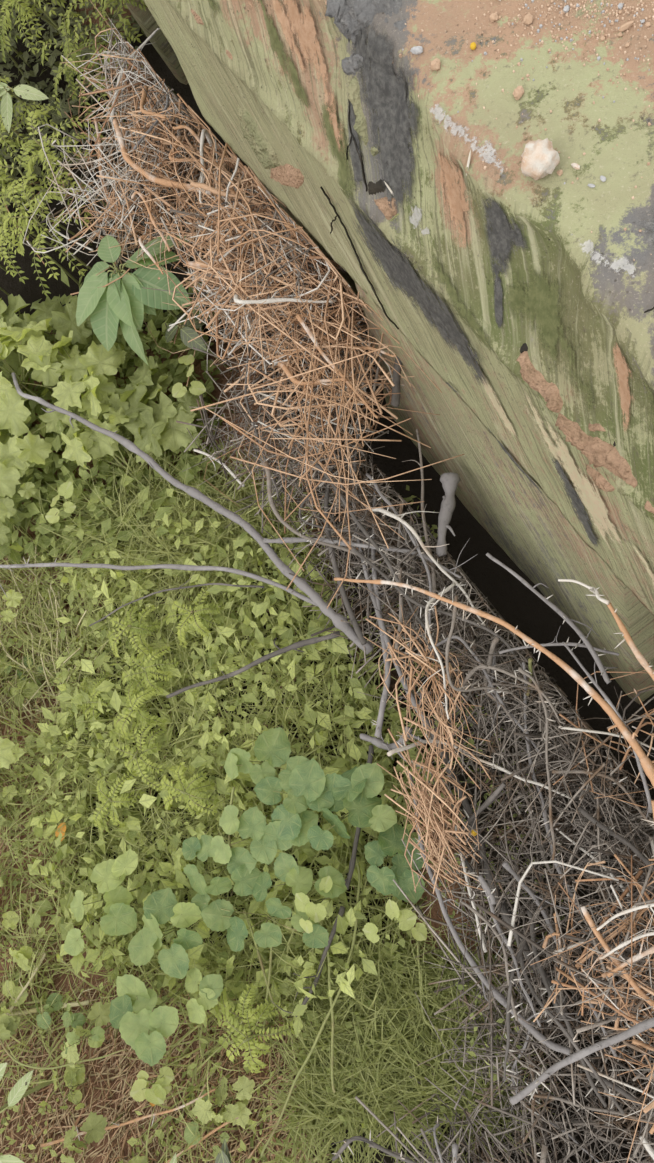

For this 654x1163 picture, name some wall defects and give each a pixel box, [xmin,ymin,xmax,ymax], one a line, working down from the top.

crack [346,95,368,192]
leakage [348,22,504,210]
crack [320,186,399,329]
leakage [571,234,636,277]
corrosion [613,343,633,431]